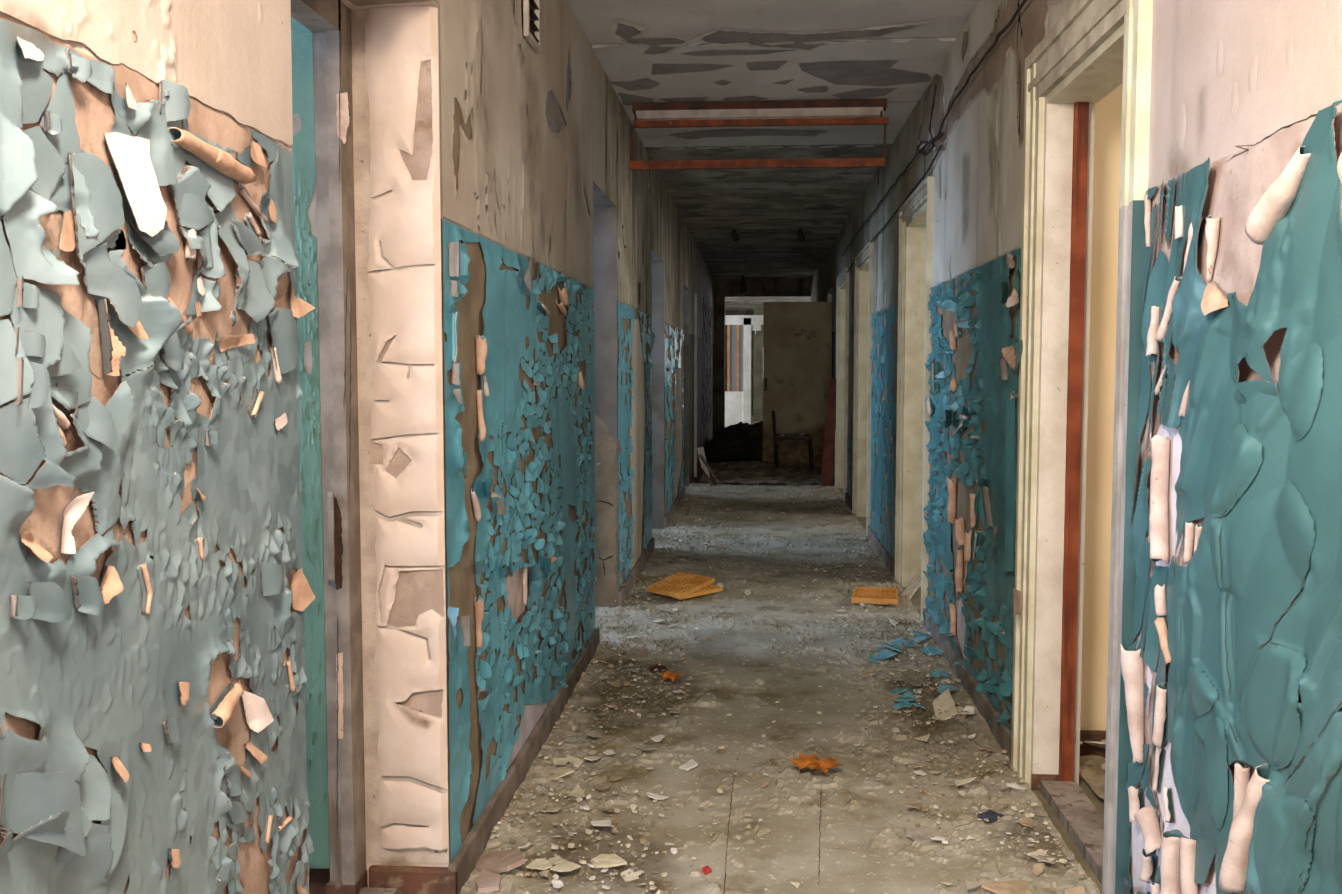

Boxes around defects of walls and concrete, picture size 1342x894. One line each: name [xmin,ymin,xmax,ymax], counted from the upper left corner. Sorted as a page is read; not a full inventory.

peeling [399,60,433,180]
peeling [608,0,1062,199]
peeling [11,63,315,449]
peeling [1145,116,1316,396]
peeling [20,488,94,563]
peeling [10,552,124,623]
peeling [388,241,569,842]
peeling [946,252,1023,660]
peeling [1154,584,1171,665]
peeling [1149,380,1204,567]
peeling [207,653,274,824]
peeling [1120,643,1270,894]